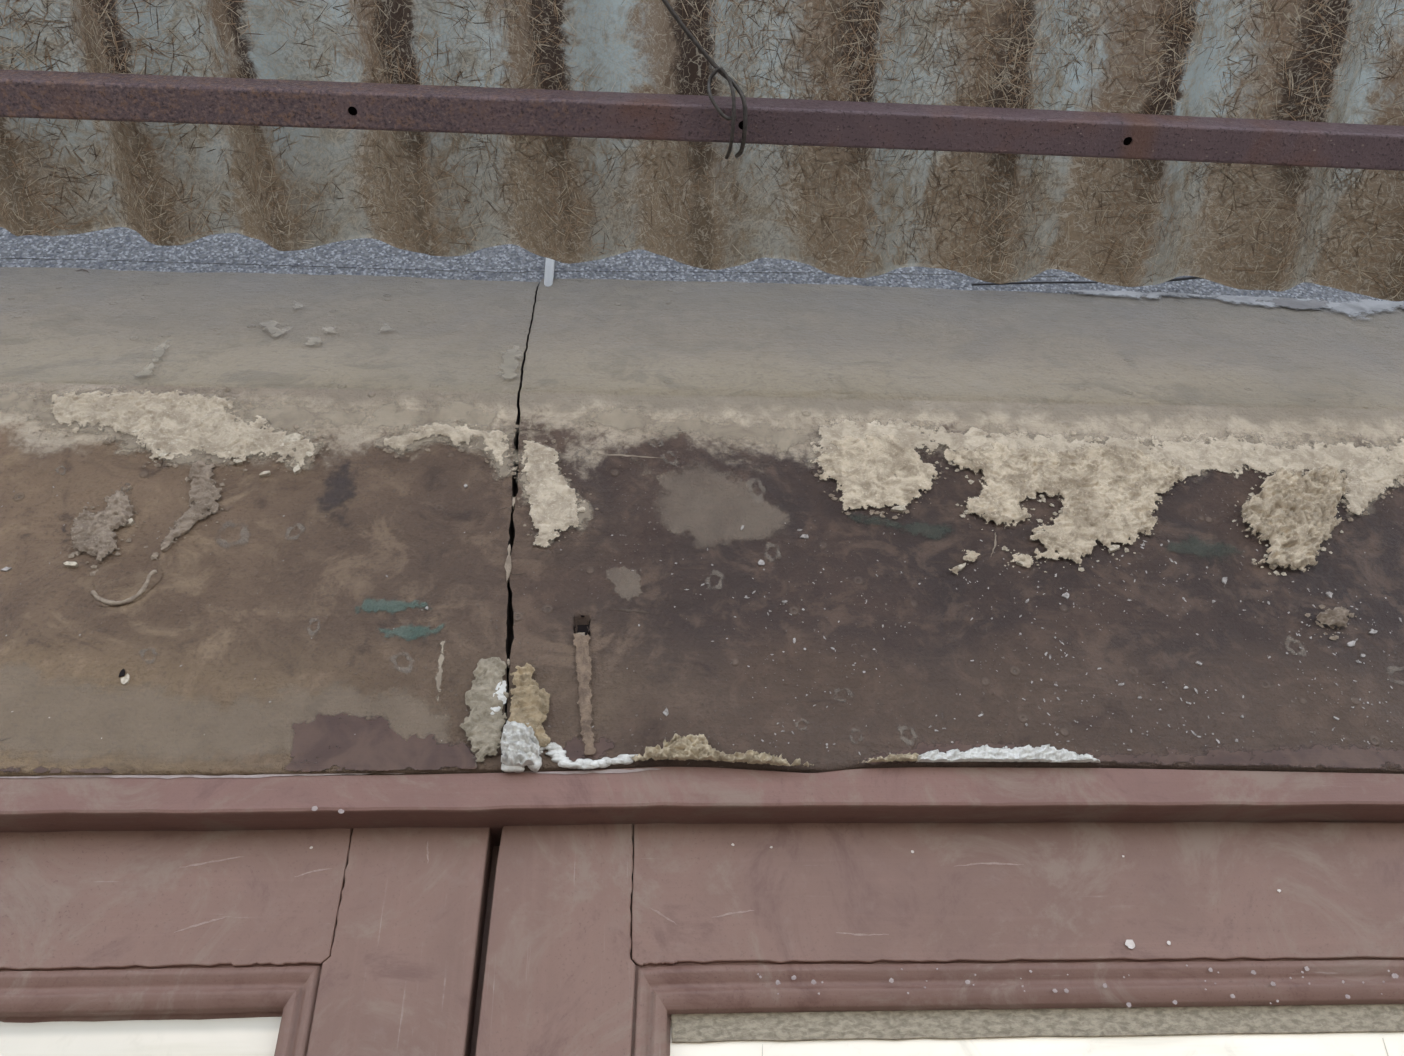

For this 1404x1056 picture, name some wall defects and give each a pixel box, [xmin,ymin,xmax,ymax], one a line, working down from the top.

peeling [28,340,337,576]
peeling [376,420,599,547]
crack [498,284,546,773]
spalling [808,417,1404,578]
peeling [119,669,130,685]
rust [573,615,596,755]
spalling [1305,604,1357,640]
spalling [520,733,814,774]
spalling [858,753,919,763]